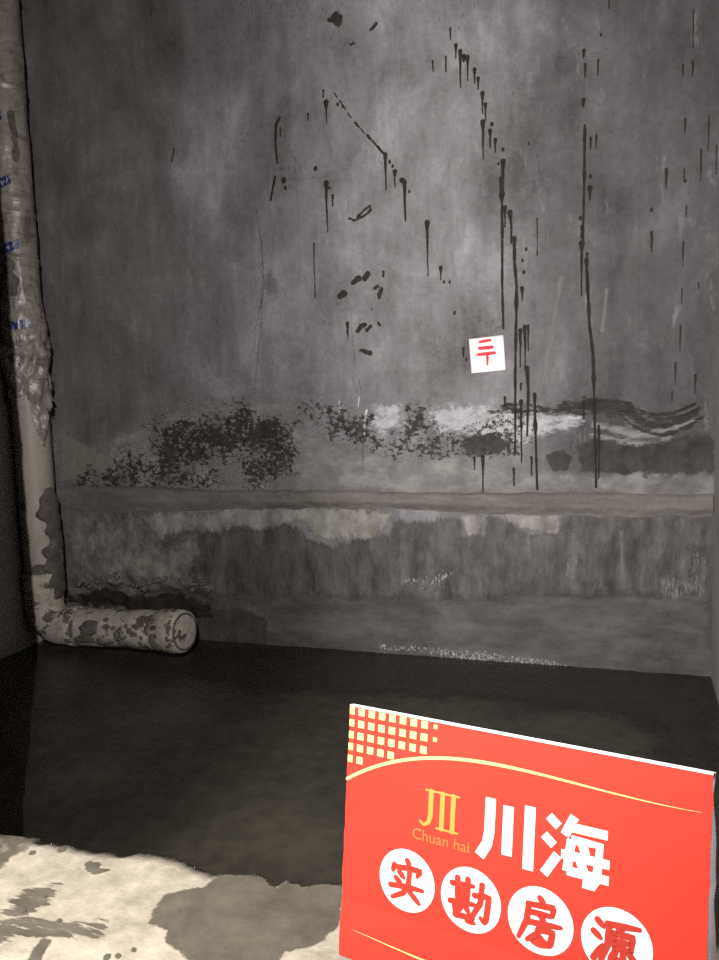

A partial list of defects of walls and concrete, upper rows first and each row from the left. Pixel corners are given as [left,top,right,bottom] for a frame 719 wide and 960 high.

leakage [327,11,343,27]
leakage [700,115,717,180]
leakage [73,27,714,494]
leakage [155,516,717,769]
leakage [0,836,36,867]
leakage [84,861,110,874]
leakage [0,882,109,960]
leakage [148,875,342,960]